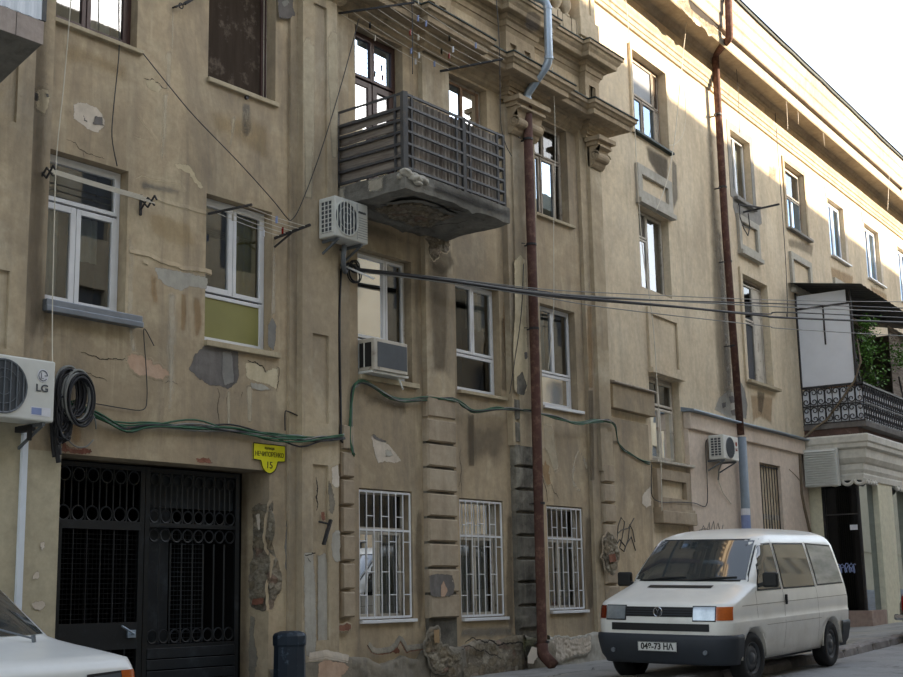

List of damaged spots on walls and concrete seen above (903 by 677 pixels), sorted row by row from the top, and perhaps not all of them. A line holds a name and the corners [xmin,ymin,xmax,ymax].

peeling [678,0,722,40]
peeling [73,102,105,133]
peeling [155,267,208,291]
flaking render [125,351,171,382]
peeling [189,346,278,391]
peeling [371,434,401,463]
flaking render [600,531,620,577]
flaking render [248,499,283,677]
peeling [304,530,341,657]
peeling [429,574,455,597]
flaking render [318,660,349,677]
flaking render [367,625,486,677]